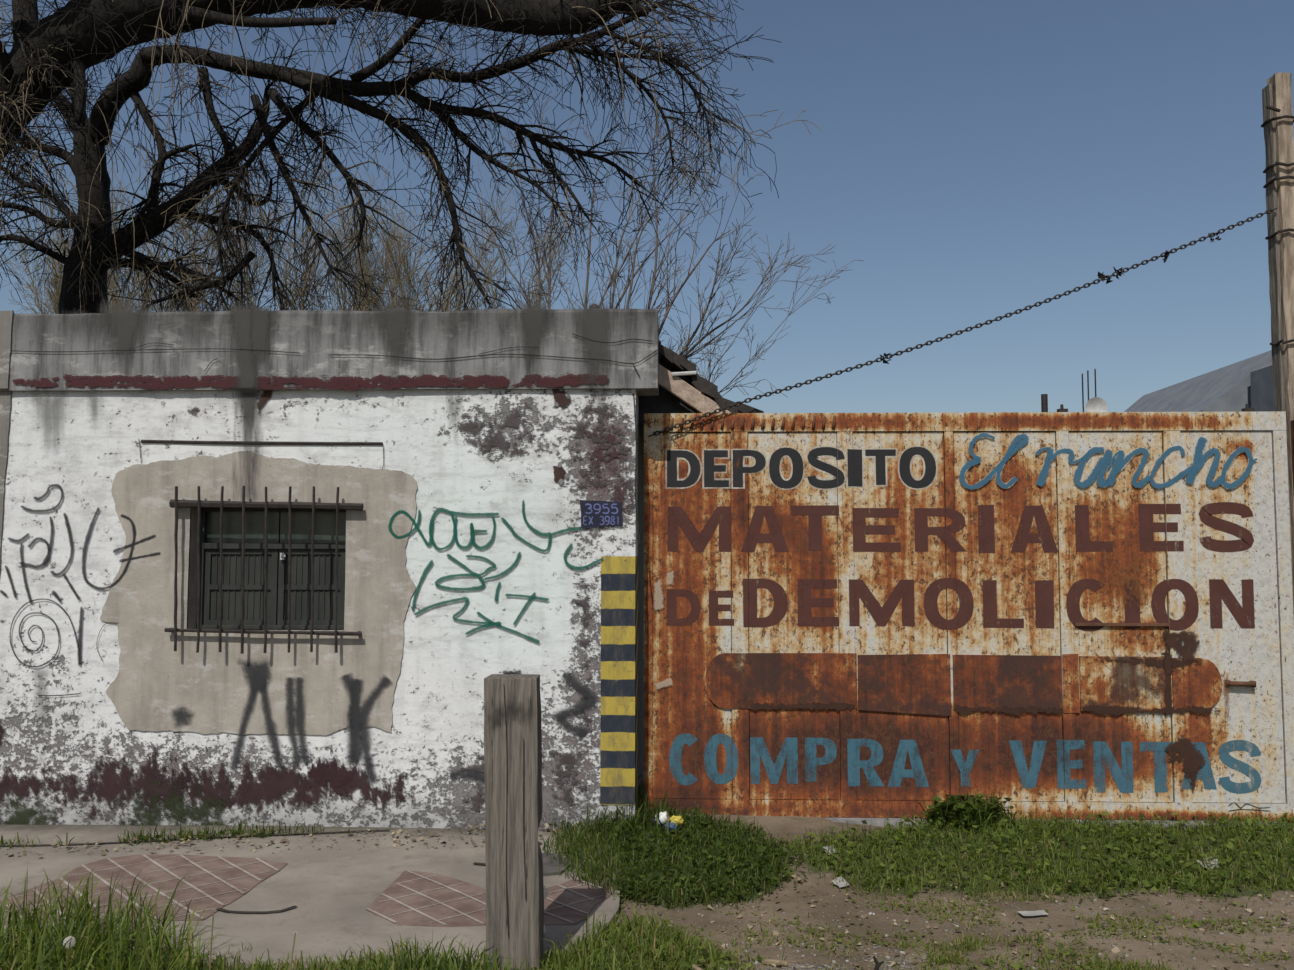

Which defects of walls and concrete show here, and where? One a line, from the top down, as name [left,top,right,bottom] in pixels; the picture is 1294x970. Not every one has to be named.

peeling [12,374,238,390]
leakage [231,303,269,494]
peeling [255,373,635,530]
leakage [520,302,546,370]
flaking render [0,451,418,823]